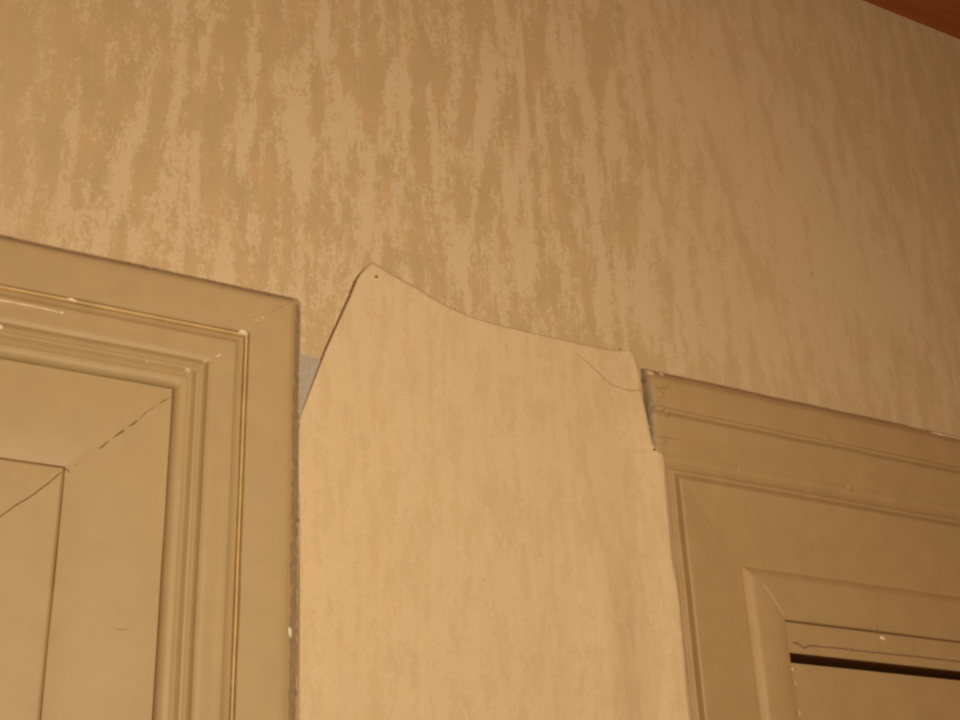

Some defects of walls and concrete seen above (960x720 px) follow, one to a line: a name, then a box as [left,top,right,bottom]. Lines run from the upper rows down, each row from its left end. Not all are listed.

flaking render [299,353,320,419]